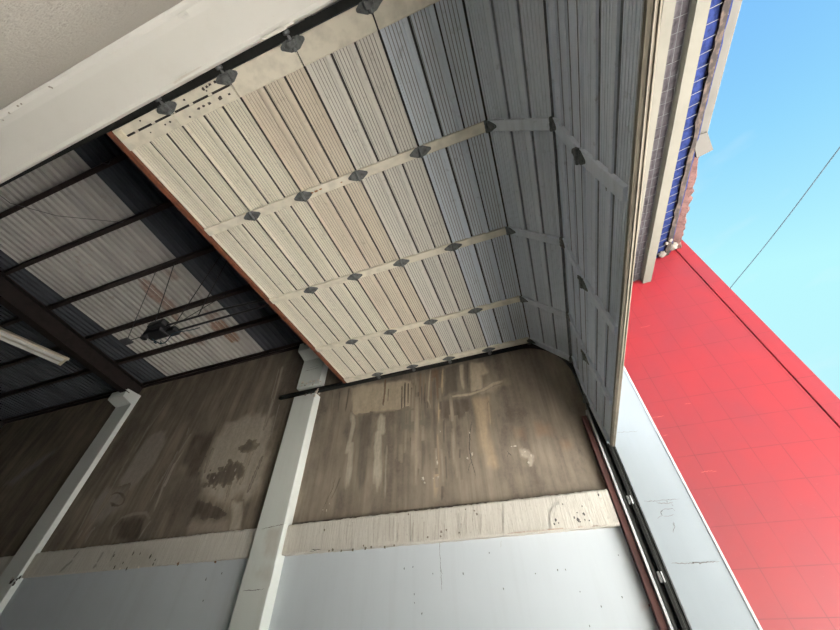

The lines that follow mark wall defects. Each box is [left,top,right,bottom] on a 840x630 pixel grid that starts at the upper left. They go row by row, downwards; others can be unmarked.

damp [57,366,284,573]
damp [248,361,569,587]